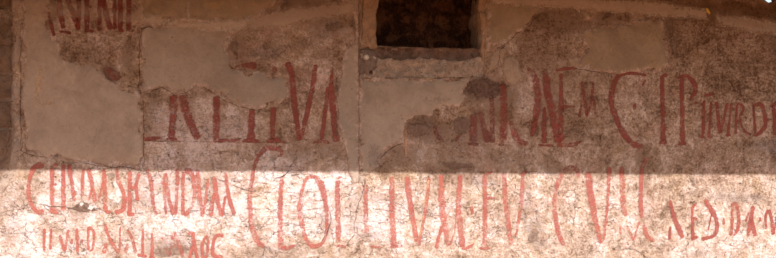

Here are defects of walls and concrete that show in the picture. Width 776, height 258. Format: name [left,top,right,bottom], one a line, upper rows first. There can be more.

flaking render [104,67,122,81]
crack [77,26,252,170]
flaking render [463,78,510,99]